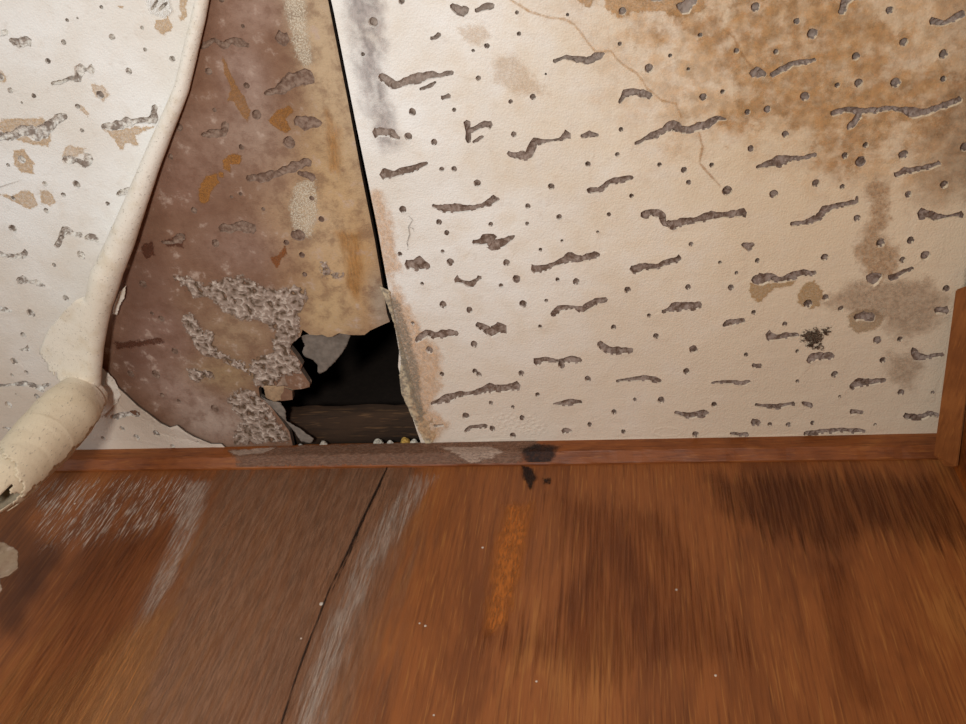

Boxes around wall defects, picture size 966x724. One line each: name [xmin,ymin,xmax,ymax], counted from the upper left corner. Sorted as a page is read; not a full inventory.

damp [605,0,730,44]
damp [720,0,963,168]
peeling [0,0,391,513]
damp [749,281,823,309]
damp [800,327,831,351]
damp [837,183,937,333]
damp [521,444,557,488]
peeling [0,542,19,593]
damp [15,475,207,724]
crack [281,467,387,723]